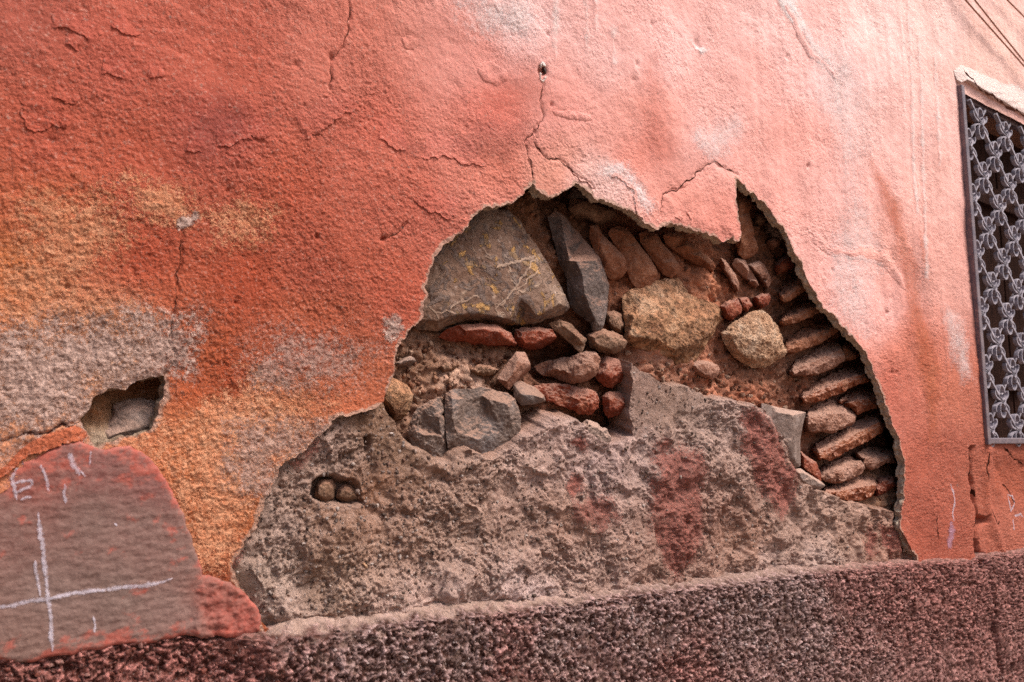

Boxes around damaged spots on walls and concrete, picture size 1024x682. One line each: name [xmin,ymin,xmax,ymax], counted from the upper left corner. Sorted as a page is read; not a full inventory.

crack [525,87,575,183]
spalling [0,375,166,479]
spalling [232,159,918,626]
crack [968,448,1023,553]